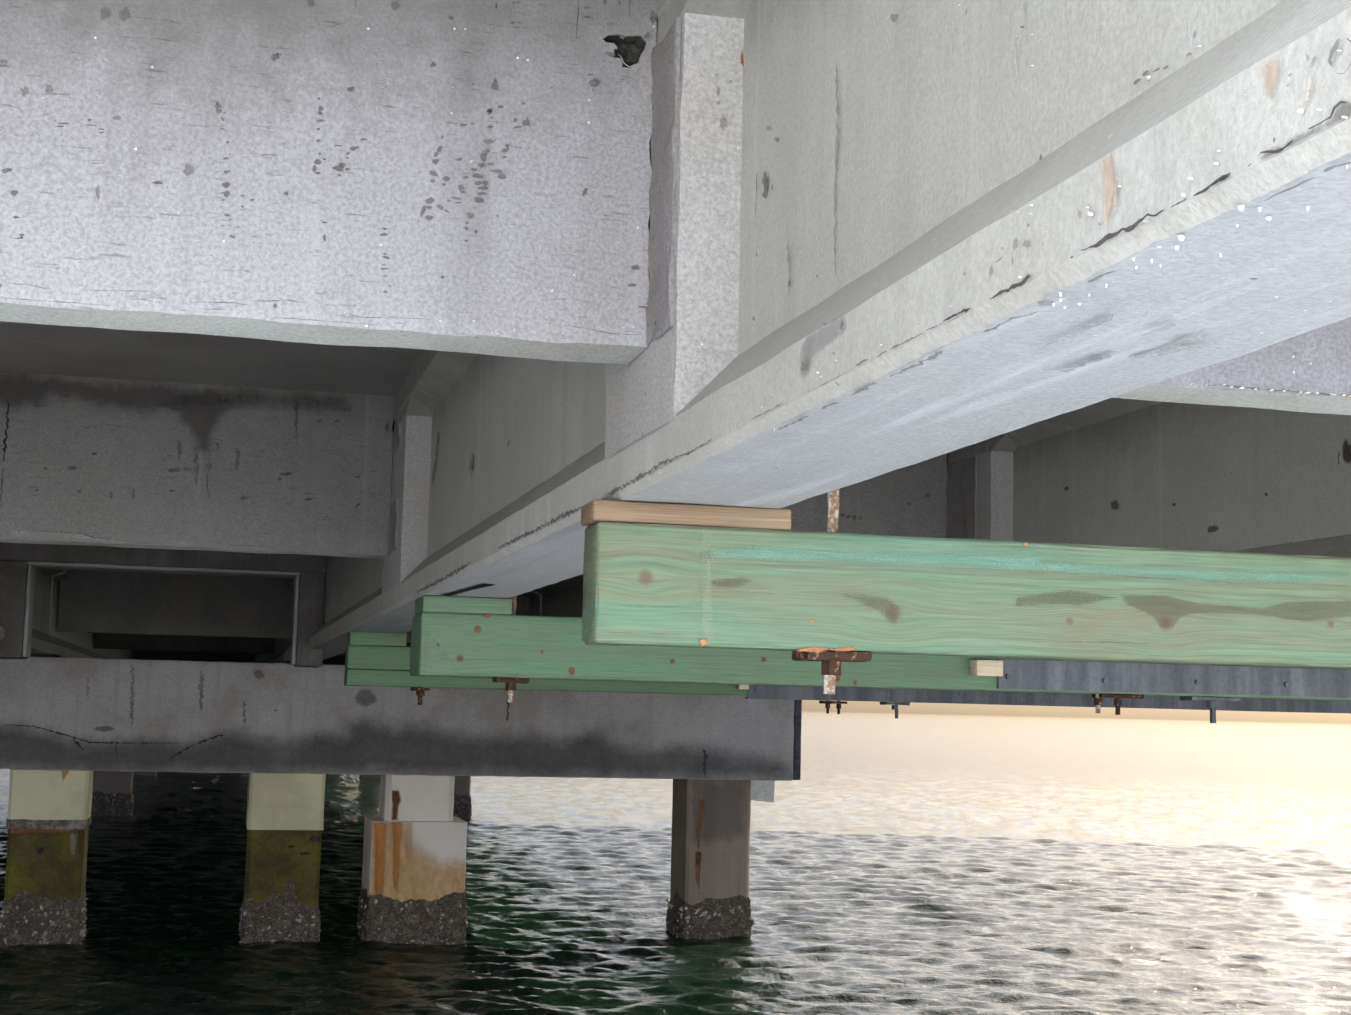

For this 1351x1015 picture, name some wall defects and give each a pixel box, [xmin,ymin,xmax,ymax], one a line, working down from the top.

spalling [583,0,657,68]
crack [1071,101,1351,282]
crack [752,274,1053,430]
crack [417,440,710,593]
damp [0,724,784,776]
rust [370,791,466,902]
rust [696,800,705,885]